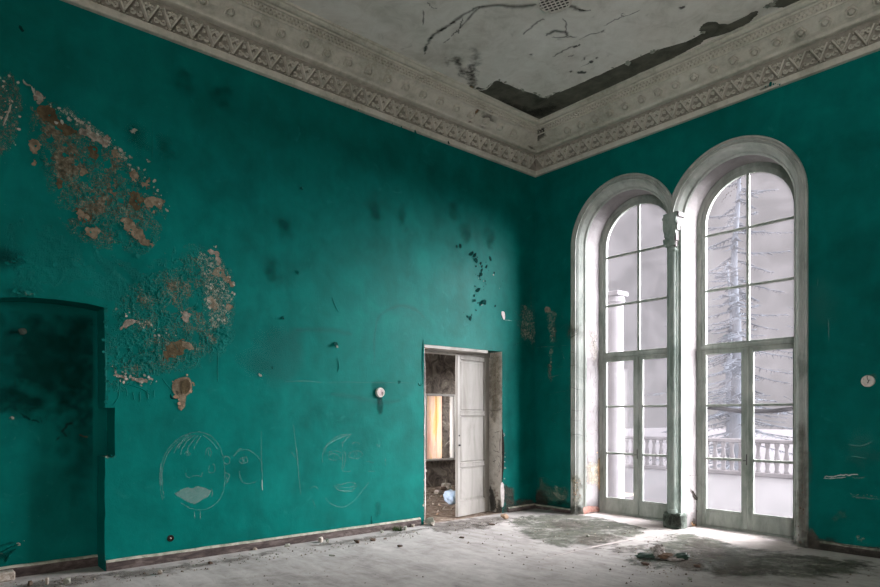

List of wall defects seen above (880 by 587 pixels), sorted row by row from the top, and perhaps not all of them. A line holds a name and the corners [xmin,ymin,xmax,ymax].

crack [423,3,638,67]
peeling [0,72,237,410]
peeling [456,244,535,341]